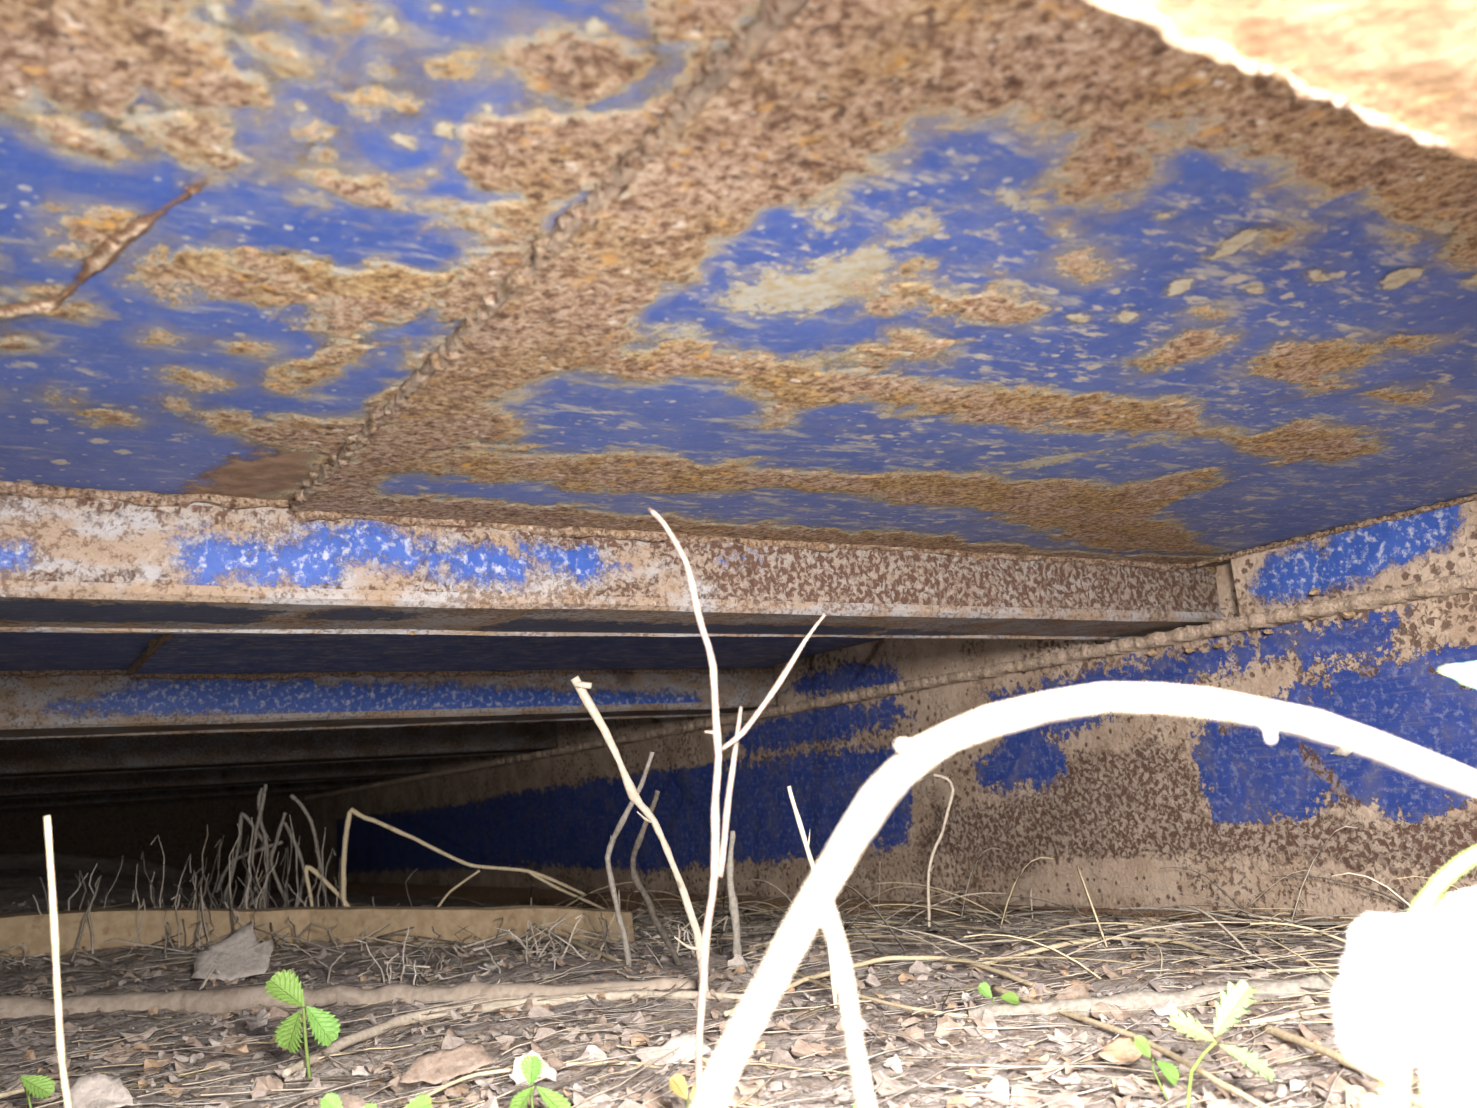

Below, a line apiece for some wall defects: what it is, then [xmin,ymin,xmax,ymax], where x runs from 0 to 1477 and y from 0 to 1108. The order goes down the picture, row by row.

spalling [390,120,456,150]
crack [0,181,207,317]
rust [0,0,1477,613]
peeling [703,203,950,322]
peeling [1128,303,1240,375]
peeling [1234,332,1454,406]
peeling [42,677,719,719]
peeling [974,504,1477,773]
rust [1354,664,1380,678]
peeling [970,712,1136,798]
rust [918,736,1477,880]
peeling [1191,718,1475,829]